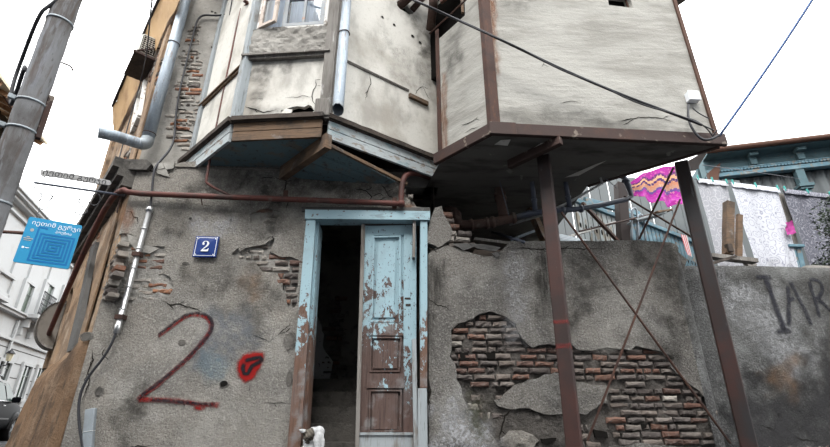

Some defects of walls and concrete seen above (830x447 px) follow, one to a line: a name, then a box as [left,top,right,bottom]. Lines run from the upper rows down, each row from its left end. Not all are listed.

spalling [165,25,203,151]
crack [246,79,320,113]
spalling [98,234,173,304]
spalling [232,235,303,310]
spalling [450,312,566,447]
spalling [572,347,718,447]